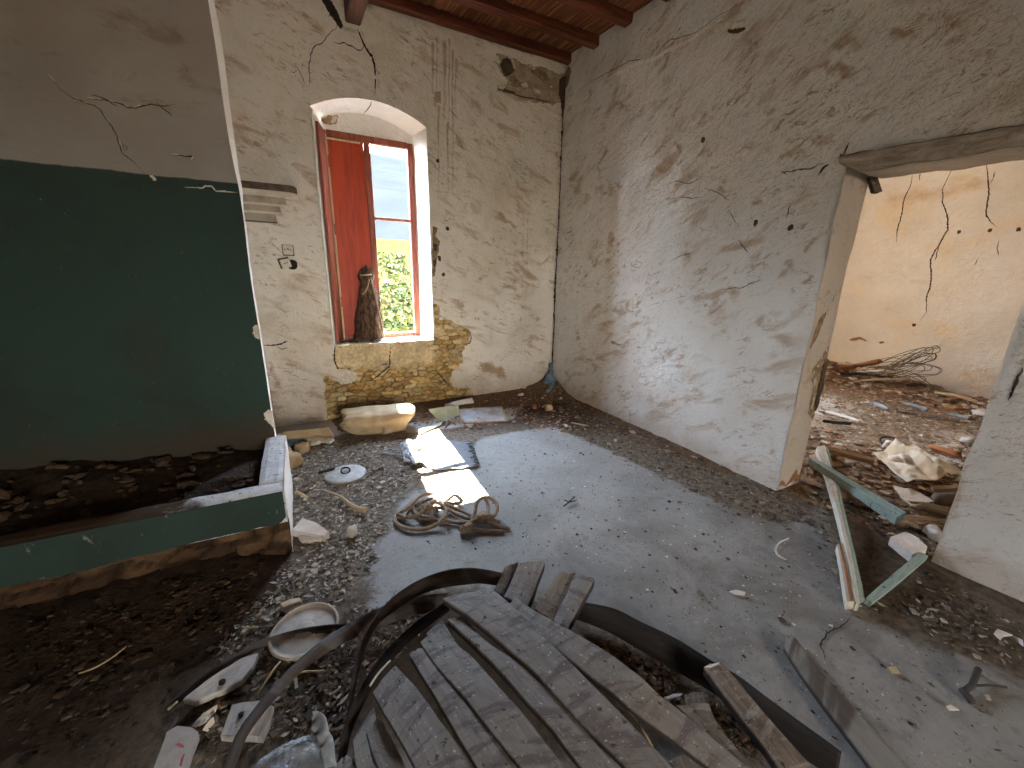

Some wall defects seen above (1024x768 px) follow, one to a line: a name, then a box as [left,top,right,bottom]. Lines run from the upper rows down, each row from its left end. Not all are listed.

crack [293,5,380,114]
spalling [496,53,571,117]
crack [50,76,172,170]
crack [186,185,238,193]
spalling [432,227,440,277]
crack [896,172,951,317]
crack [974,165,999,265]
spalling [323,304,473,420]
spalling [808,351,829,420]
crack [1008,367,1023,401]
crack [819,617,851,660]